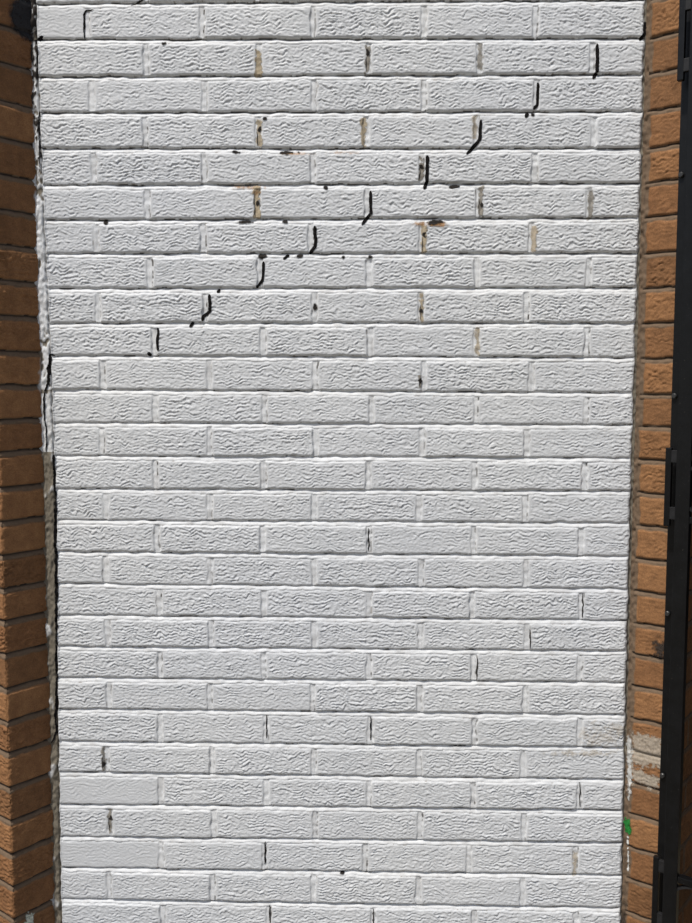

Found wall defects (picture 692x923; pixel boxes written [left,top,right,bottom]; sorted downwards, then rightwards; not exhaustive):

crack [83,9,93,40]
crack [639,22,647,41]
crack [591,44,599,79]
crack [525,82,540,118]
crack [466,119,482,154]
crack [422,155,430,189]
crack [362,191,373,225]
crack [256,226,317,288]
crack [189,289,221,327]
crack [147,328,159,356]
crack [43,354,59,743]